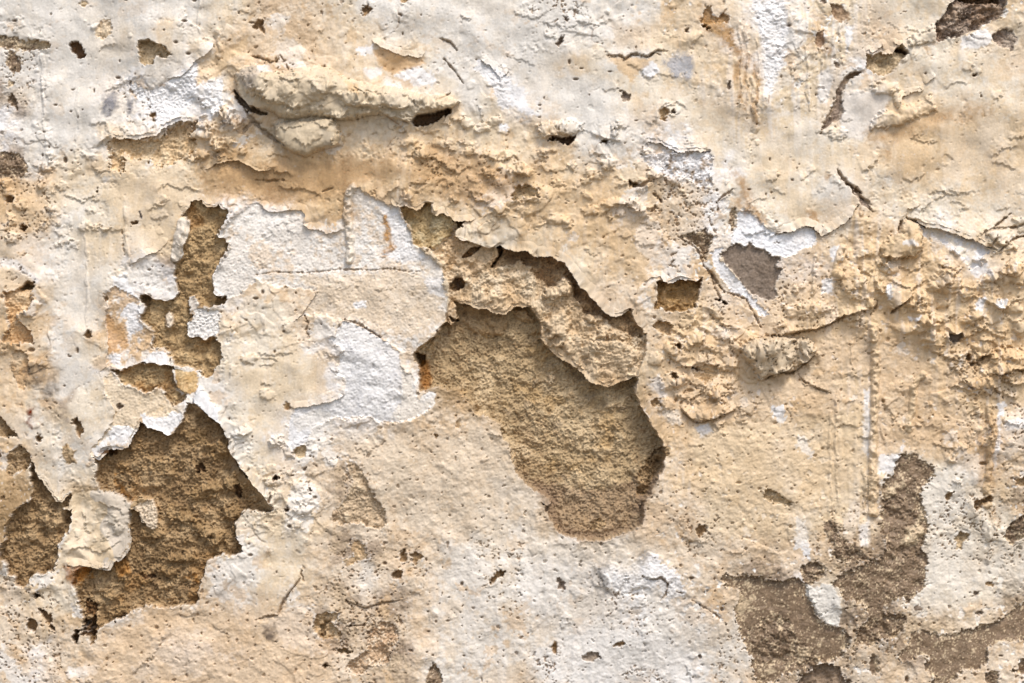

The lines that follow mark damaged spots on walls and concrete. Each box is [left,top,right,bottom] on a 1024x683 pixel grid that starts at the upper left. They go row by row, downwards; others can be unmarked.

crack [820,70,863,135]
flaking render [935,0,1019,53]
flaking render [0,187,858,646]
flaking render [720,453,1024,683]